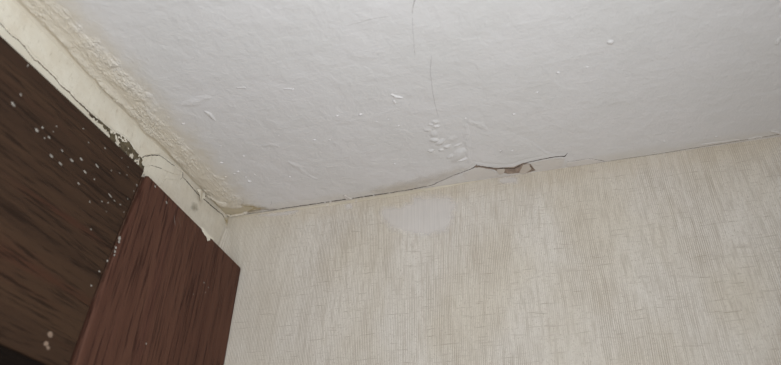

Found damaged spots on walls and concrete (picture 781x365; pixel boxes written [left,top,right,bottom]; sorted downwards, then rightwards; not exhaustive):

crack [0,21,110,137]
flaking render [12,0,567,218]
crack [136,153,226,221]
crack [249,166,475,214]